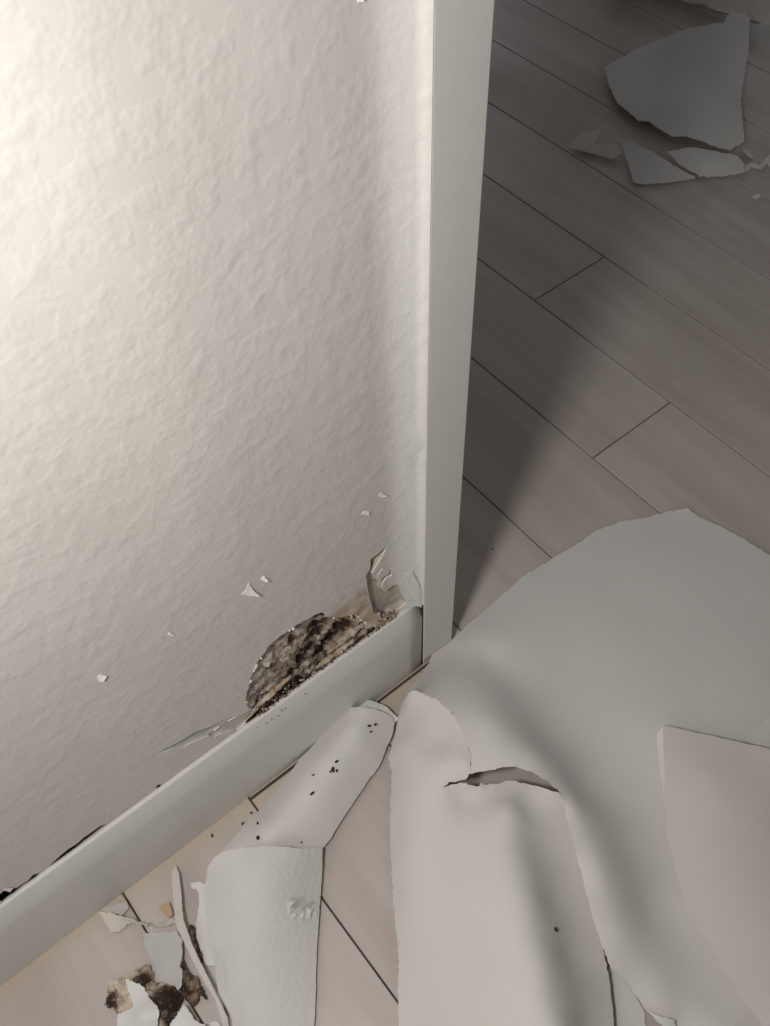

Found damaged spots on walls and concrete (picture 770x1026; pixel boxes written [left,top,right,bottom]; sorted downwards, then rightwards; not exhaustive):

flaking render [207,548,428,737]